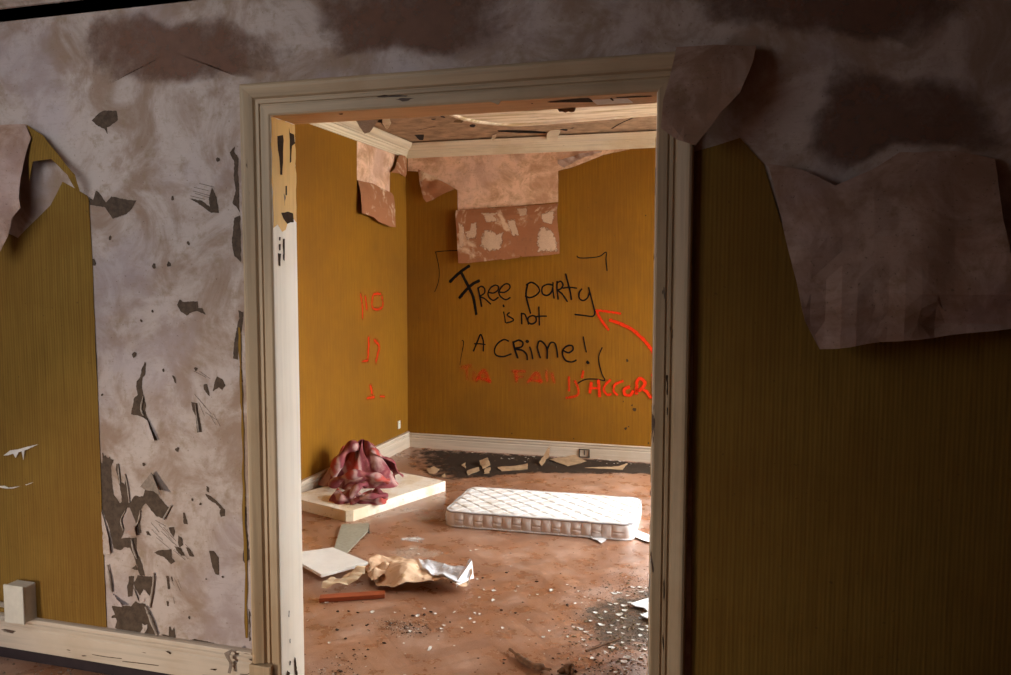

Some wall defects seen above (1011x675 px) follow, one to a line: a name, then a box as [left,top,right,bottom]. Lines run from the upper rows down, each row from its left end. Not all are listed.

peeling [277,130,295,175]
flaking render [357,119,629,210]
flaking render [89,191,136,219]
flaking render [191,189,219,213]
peeling [281,212,294,224]
flaking render [177,300,206,316]
flaking render [203,377,225,396]
flaking render [131,363,157,442]
flaking render [191,402,202,432]
flaking render [205,486,225,517]
flaking render [101,453,194,638]
flaking render [209,551,219,575]